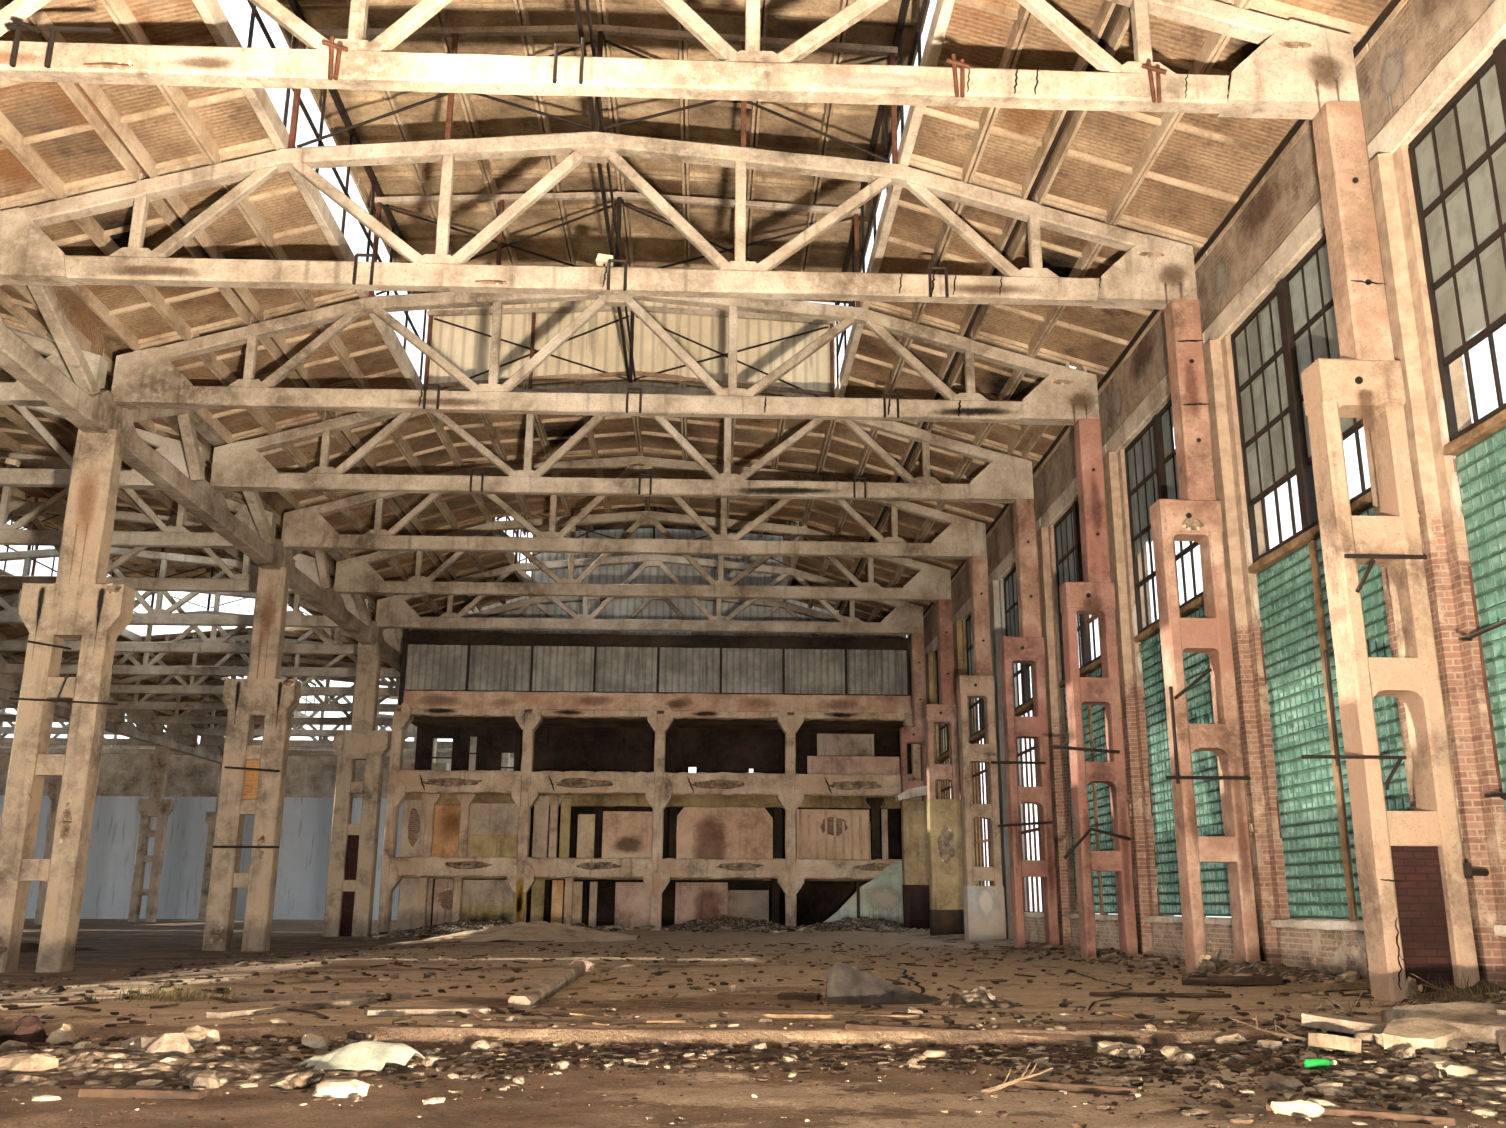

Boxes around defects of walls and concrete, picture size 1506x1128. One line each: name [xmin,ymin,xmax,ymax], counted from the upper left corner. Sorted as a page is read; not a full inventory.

water stain [1314,60,1340,109]